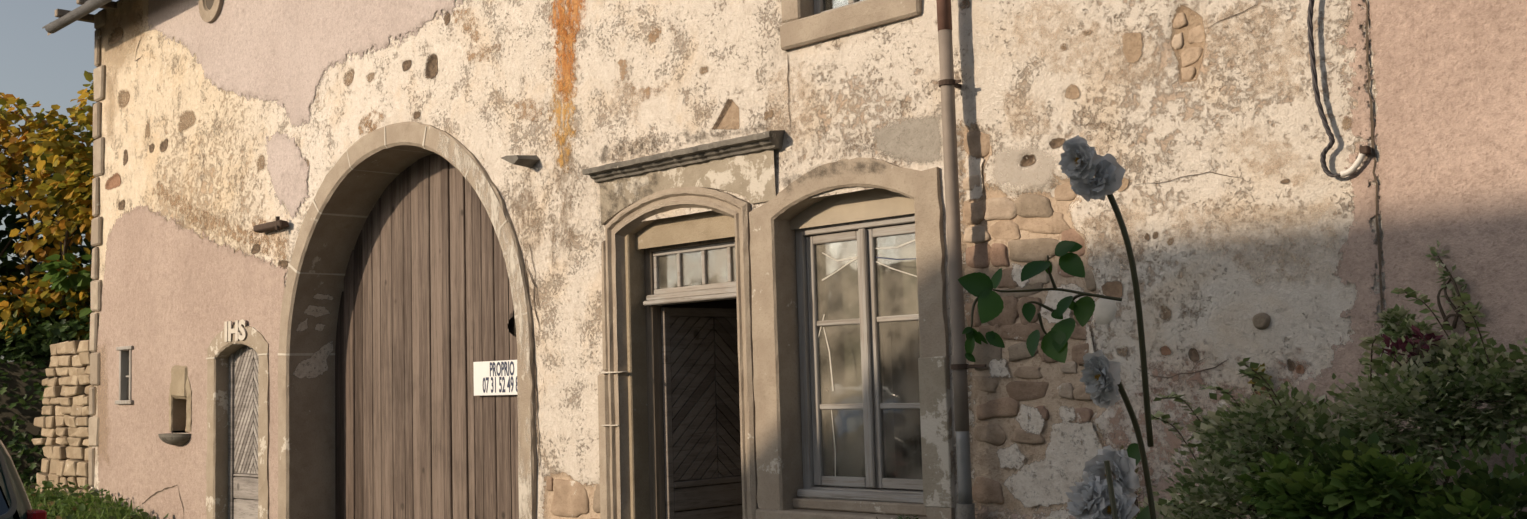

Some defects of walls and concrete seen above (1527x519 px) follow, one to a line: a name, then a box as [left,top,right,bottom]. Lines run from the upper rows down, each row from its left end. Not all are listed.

spalling [118,90,130,108]
peeling [145,0,501,219]
peeling [515,99,542,121]
corrosion [548,0,586,170]
peeling [97,149,334,519]
peeling [439,132,540,371]
peeling [956,0,1527,519]
spalling [518,460,600,519]